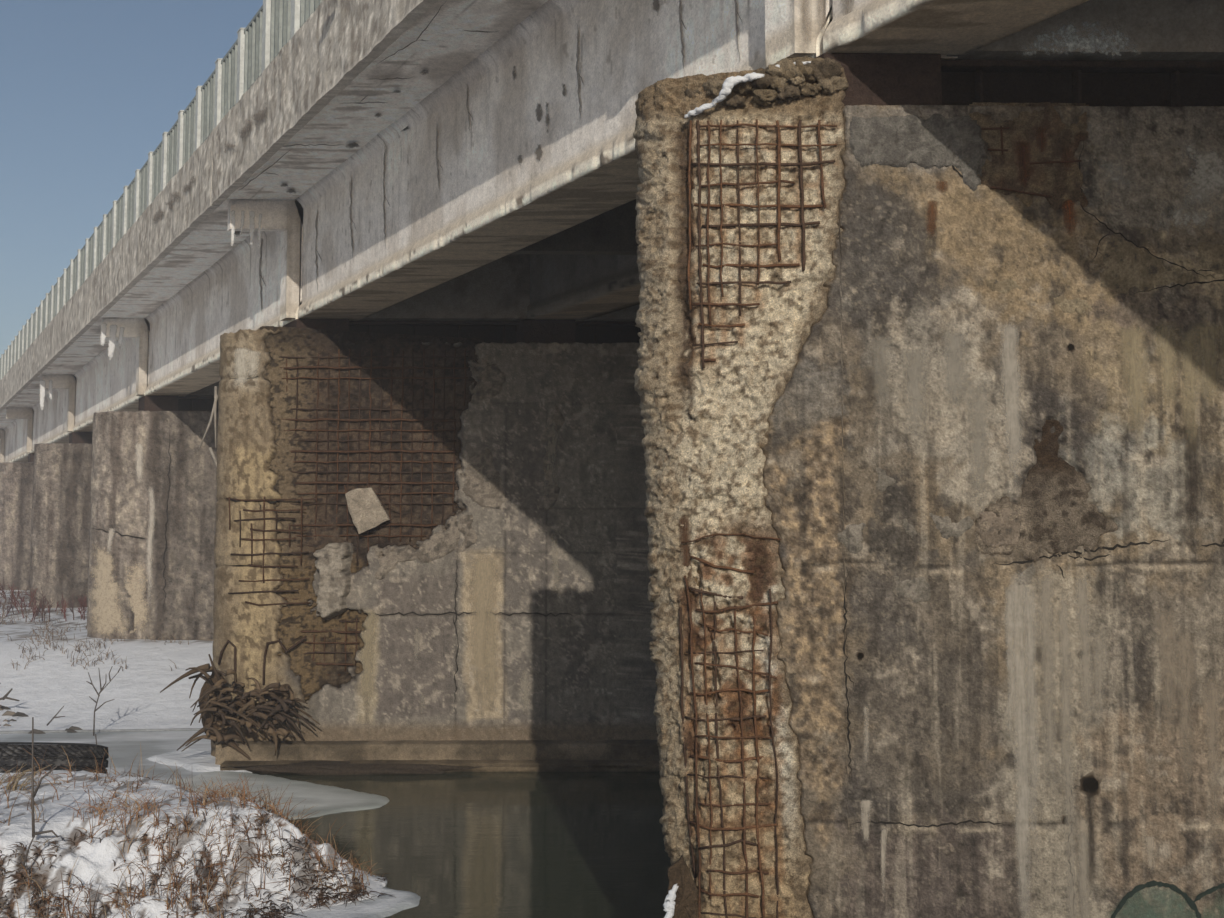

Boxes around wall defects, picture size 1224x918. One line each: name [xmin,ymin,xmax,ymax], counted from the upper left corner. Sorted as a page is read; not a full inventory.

crack [349,153,390,256]
crack [258,239,266,310]
damp [1002,326,1021,463]
damp [1161,325,1219,517]
spalling [226,326,506,700]
corrosion [680,517,691,601]
spalling [633,67,1089,918]
spalling [929,419,1118,586]
crack [992,539,1172,577]
spalling [218,640,237,682]
damp [1006,577,1103,918]
damp [861,800,887,872]